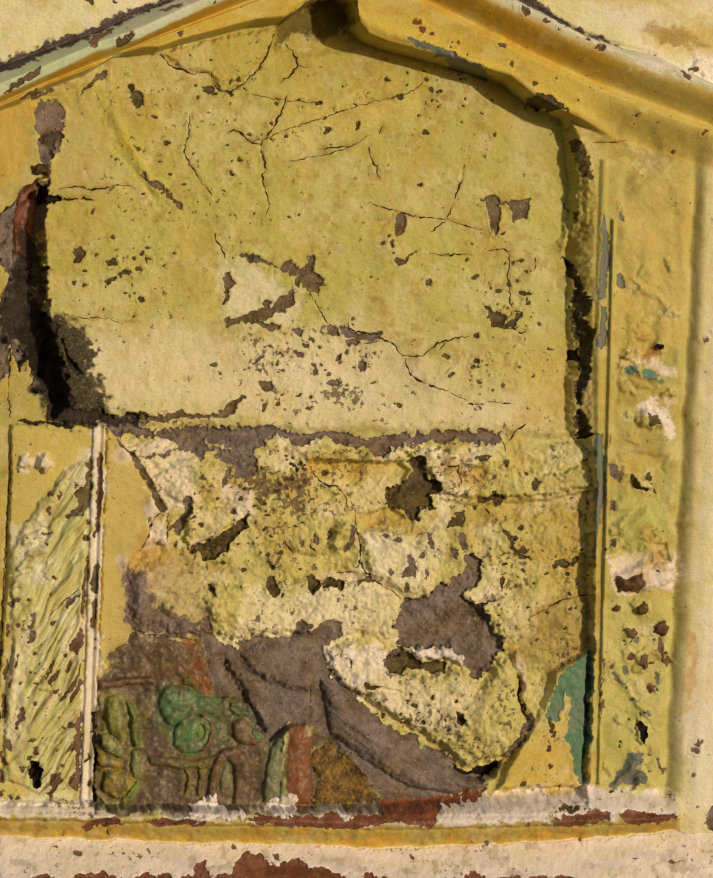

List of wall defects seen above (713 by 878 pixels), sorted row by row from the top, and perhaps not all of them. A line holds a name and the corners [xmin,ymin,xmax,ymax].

crack [158,27,425,215]
crack [371,163,482,232]
peeling [0,66,502,598]
crack [310,293,515,406]
crack [430,248,527,334]
flaking render [560,256,597,439]
peeling [6,556,101,703]
spalling [122,565,534,830]
flaking render [383,490,504,684]
peeling [614,573,649,615]
peeling [135,844,346,878]
peeling [553,804,678,827]